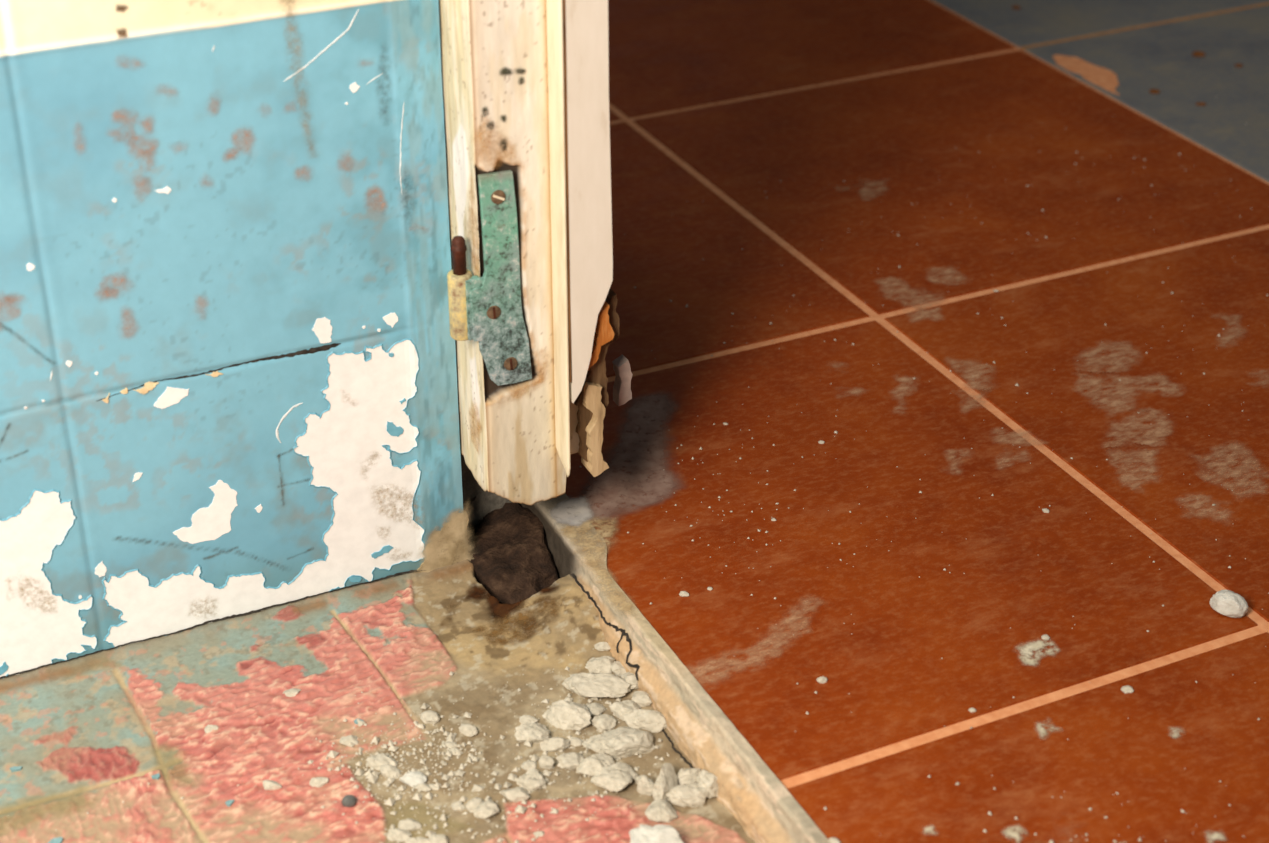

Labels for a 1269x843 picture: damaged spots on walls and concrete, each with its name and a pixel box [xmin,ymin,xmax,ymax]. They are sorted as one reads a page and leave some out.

crack [97,343,341,403]
leakage [1078,376,1177,487]
peeling [0,312,474,677]
crack [571,573,640,680]
crack [662,729,695,768]